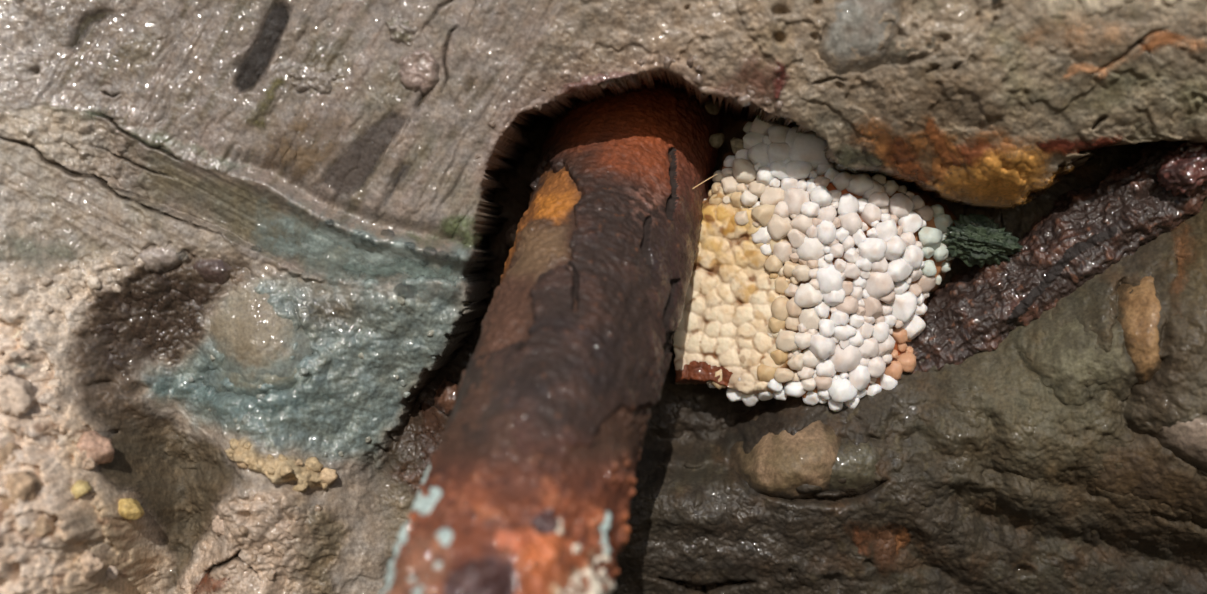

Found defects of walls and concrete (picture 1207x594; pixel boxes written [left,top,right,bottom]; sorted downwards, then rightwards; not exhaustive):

corrosion [1064,61,1113,77]
corrosion [1142,31,1207,52]
crack [0,91,222,235]
spalling [472,55,785,250]
corrosion [859,118,1018,183]
corrosion [1037,137,1117,154]
corrosion [906,140,1207,374]
spalling [660,371,1207,594]
corrosion [442,508,559,594]
peeling [558,511,615,594]